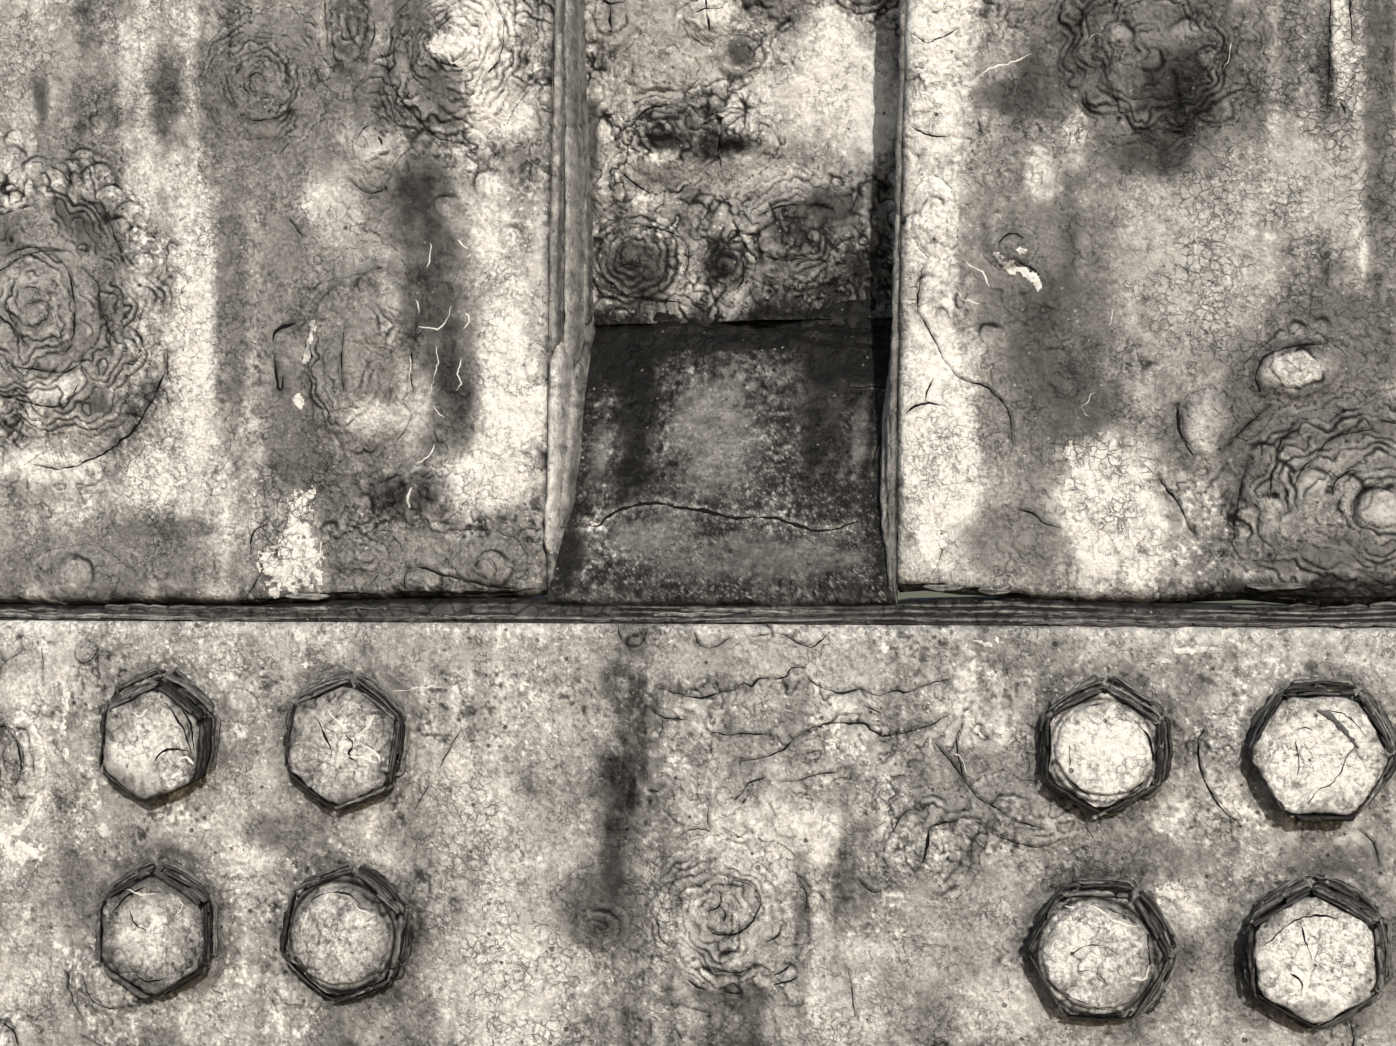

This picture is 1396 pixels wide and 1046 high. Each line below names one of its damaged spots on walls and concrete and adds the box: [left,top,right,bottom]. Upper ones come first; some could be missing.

peeling [257,485,329,601]
crack [582,501,858,532]
crack [649,631,1064,848]
crack [1058,745,1089,796]